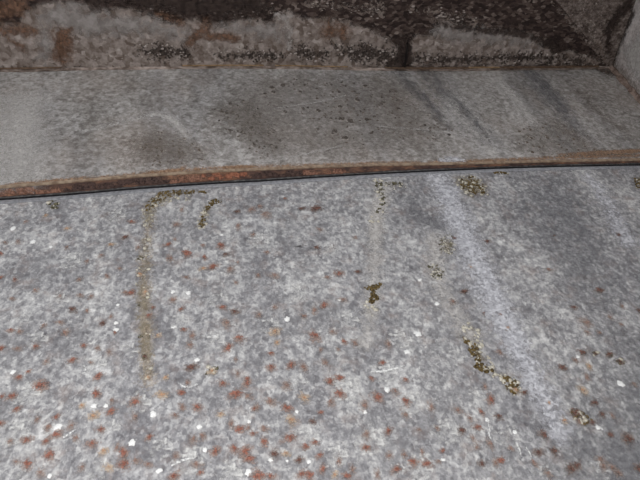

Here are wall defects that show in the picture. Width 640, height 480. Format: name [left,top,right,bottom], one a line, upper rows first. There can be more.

corrosion [0,161,419,196]
leakage [341,183,393,349]
leakage [425,174,572,446]
corrosion [8,413,74,460]
corrosion [85,439,153,471]
corrosion [173,379,202,417]
corrosion [219,371,275,411]
corrosion [228,419,327,480]
corrosion [324,374,346,407]
corrosion [402,449,441,468]
corrosion [454,407,483,450]
corrosion [561,399,615,425]